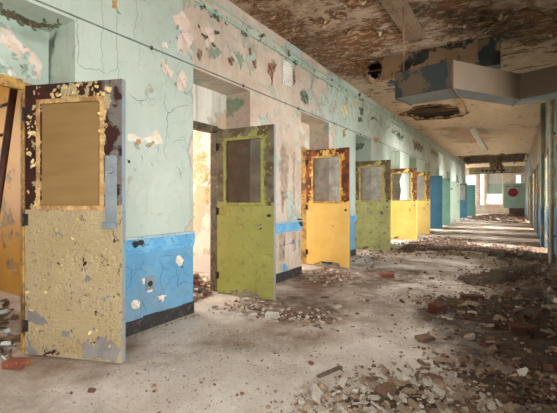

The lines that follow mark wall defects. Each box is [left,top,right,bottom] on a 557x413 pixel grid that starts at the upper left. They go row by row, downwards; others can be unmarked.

peeling [0,2,61,95]
peeling [161,11,220,57]
peeling [160,58,188,95]
spalling [127,129,163,149]